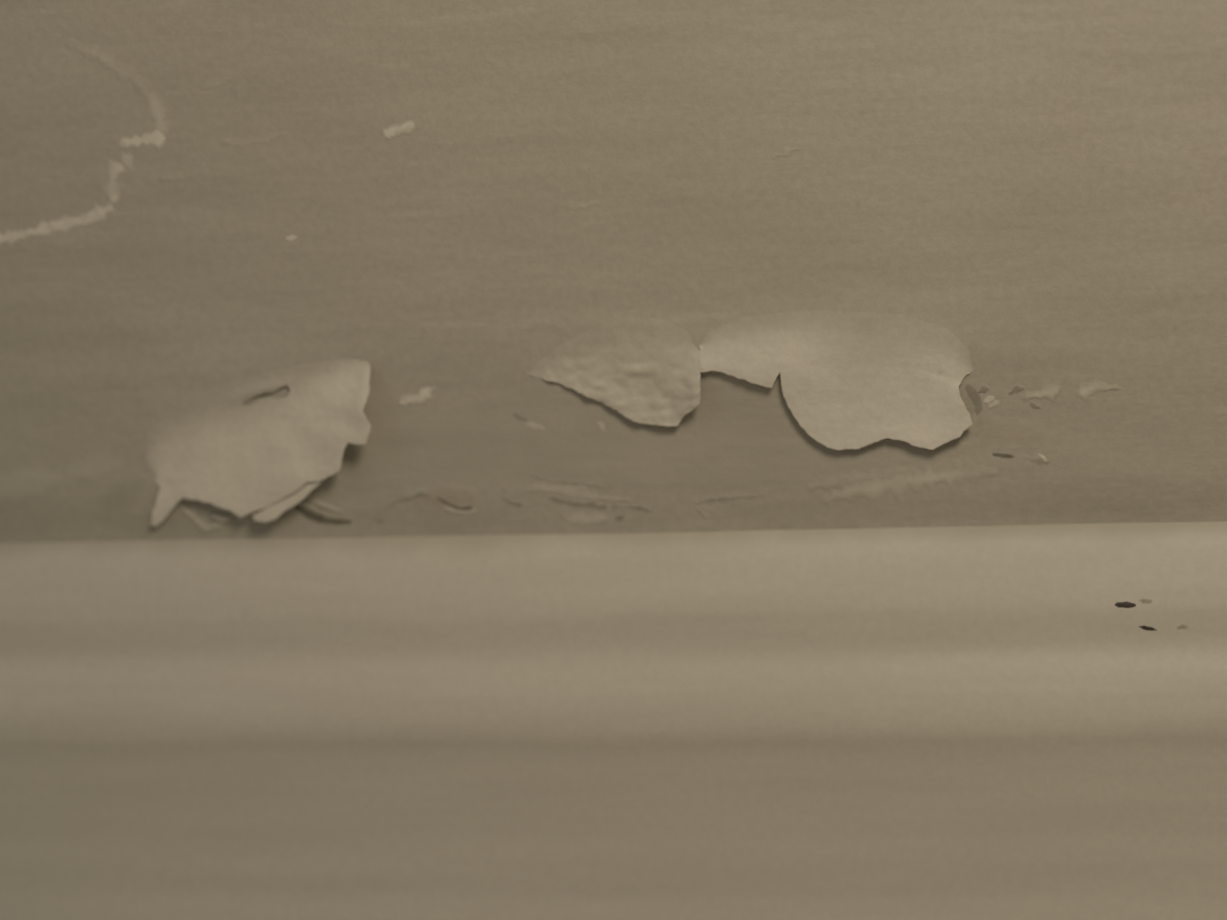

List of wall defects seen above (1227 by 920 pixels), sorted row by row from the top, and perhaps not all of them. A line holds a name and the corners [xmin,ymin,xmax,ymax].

crack [0,37,186,247]
flaking render [144,310,1052,534]